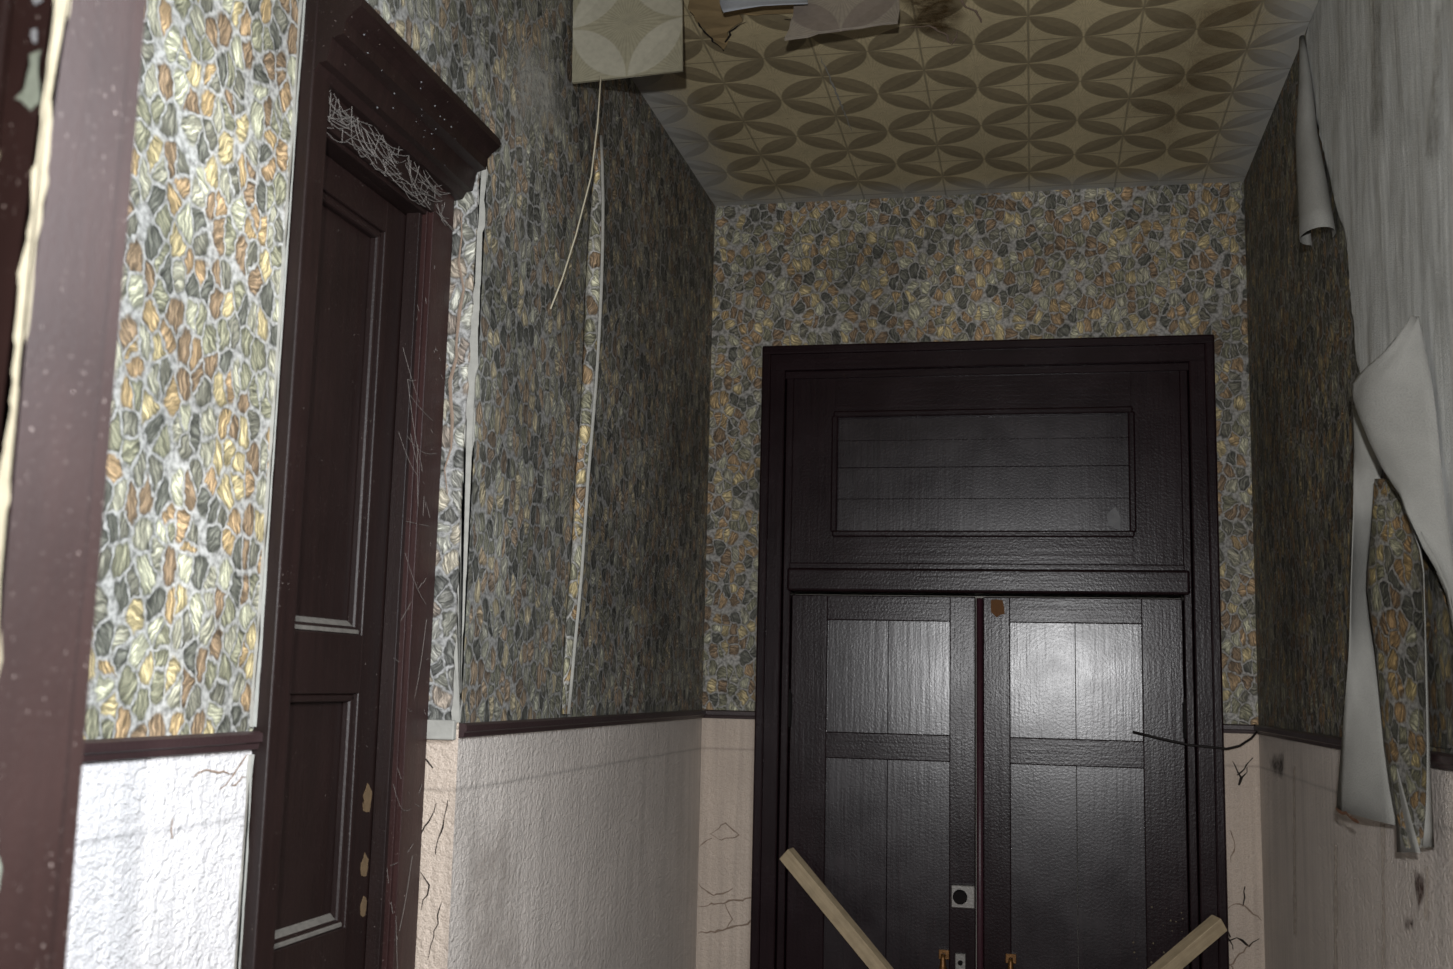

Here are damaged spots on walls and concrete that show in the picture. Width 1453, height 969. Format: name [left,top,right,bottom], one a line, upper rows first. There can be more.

peeling [0,0,71,667]
peeling [1306,0,1453,551]
crack [699,822,739,847]
crack [698,884,751,934]
crack [1233,758,1253,785]
crack [1228,830,1262,969]